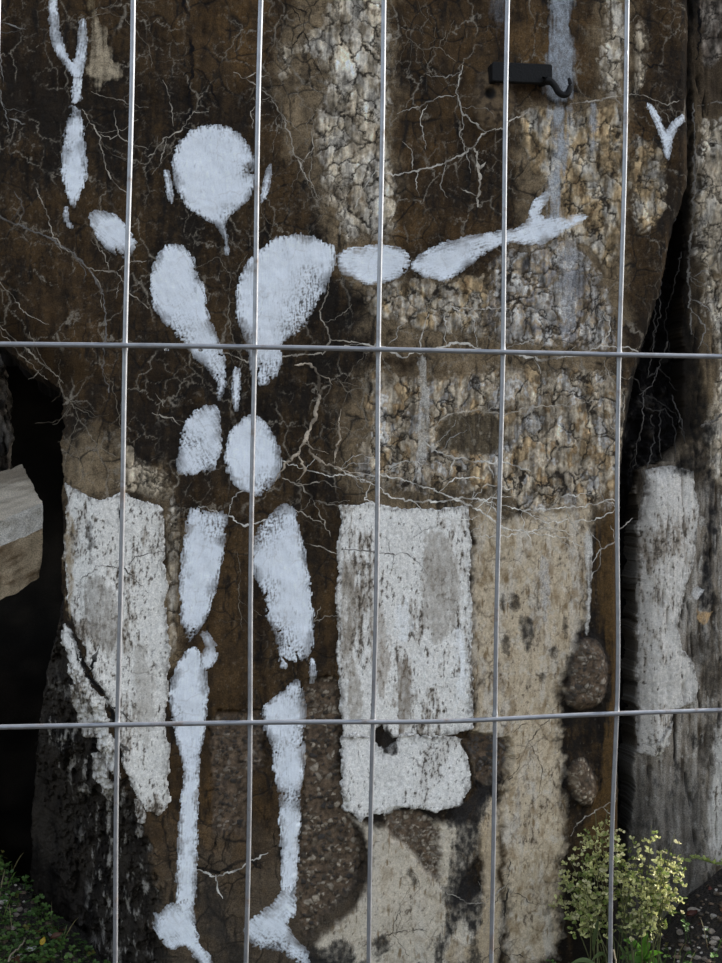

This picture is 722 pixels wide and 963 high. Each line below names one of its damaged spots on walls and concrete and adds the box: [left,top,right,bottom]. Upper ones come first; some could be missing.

crack [82,0,221,193]
peeling [275,0,400,245]
leakage [483,0,512,39]
leakage [540,0,584,348]
crack [570,24,722,361]
crack [0,188,148,485]
crack [275,283,639,583]
flaking render [295,0,670,963]
spalling [209,709,267,840]
leakage [299,930,395,963]
leakage [380,724,400,756]
leakage [417,781,492,963]